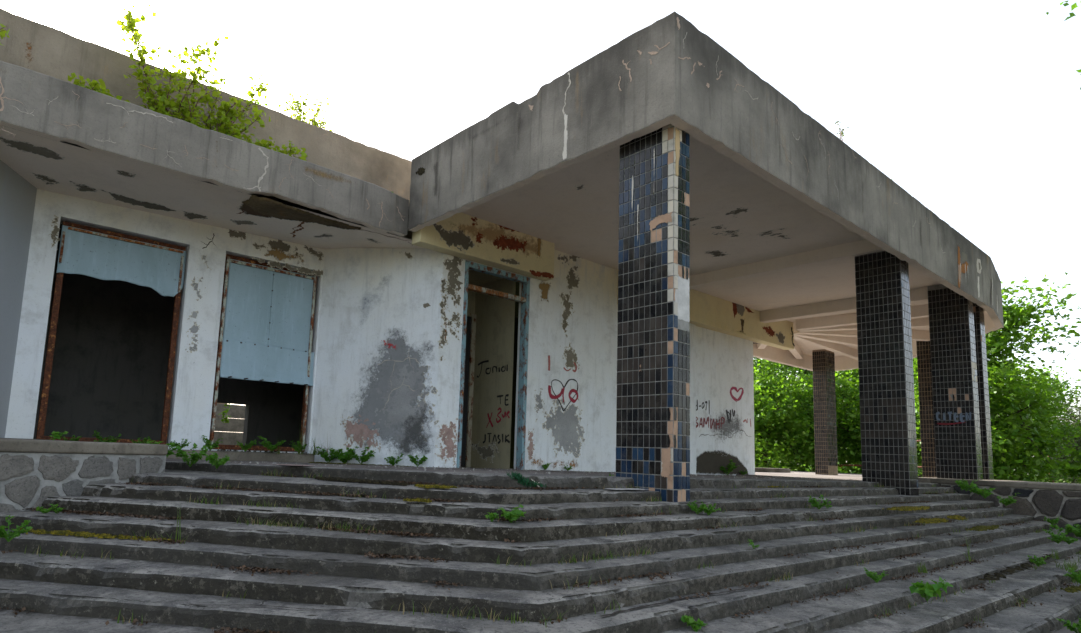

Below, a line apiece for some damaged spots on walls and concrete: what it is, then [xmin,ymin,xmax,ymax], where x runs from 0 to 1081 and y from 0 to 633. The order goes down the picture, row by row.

crack [0,77,79,139]
crack [95,103,173,143]
crack [562,72,571,129]
peeling [0,136,65,160]
peeling [30,172,208,219]
peeling [649,212,672,231]
spalling [732,302,753,318]
peeling [340,217,527,466]
peeling [753,326,785,344]
peeling [526,387,585,463]
peeling [661,447,671,479]